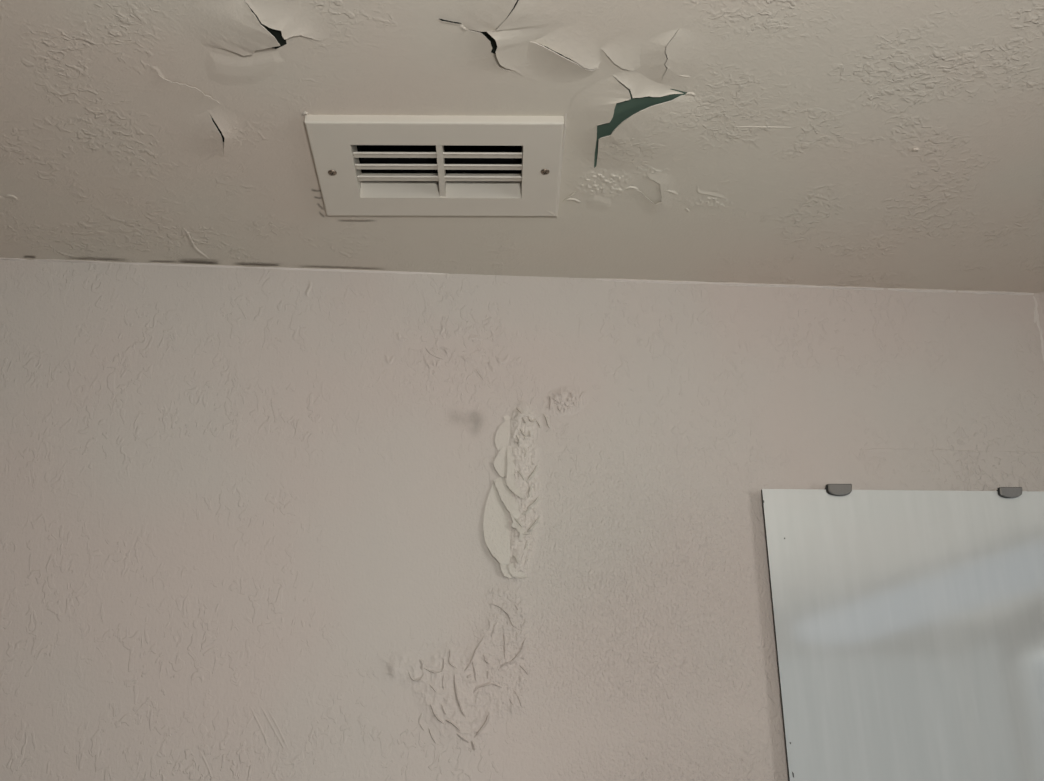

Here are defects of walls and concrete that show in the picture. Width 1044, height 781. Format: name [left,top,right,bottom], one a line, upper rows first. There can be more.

peeling [146,65,245,160]
peeling [184,0,333,86]
peeling [454,0,726,174]